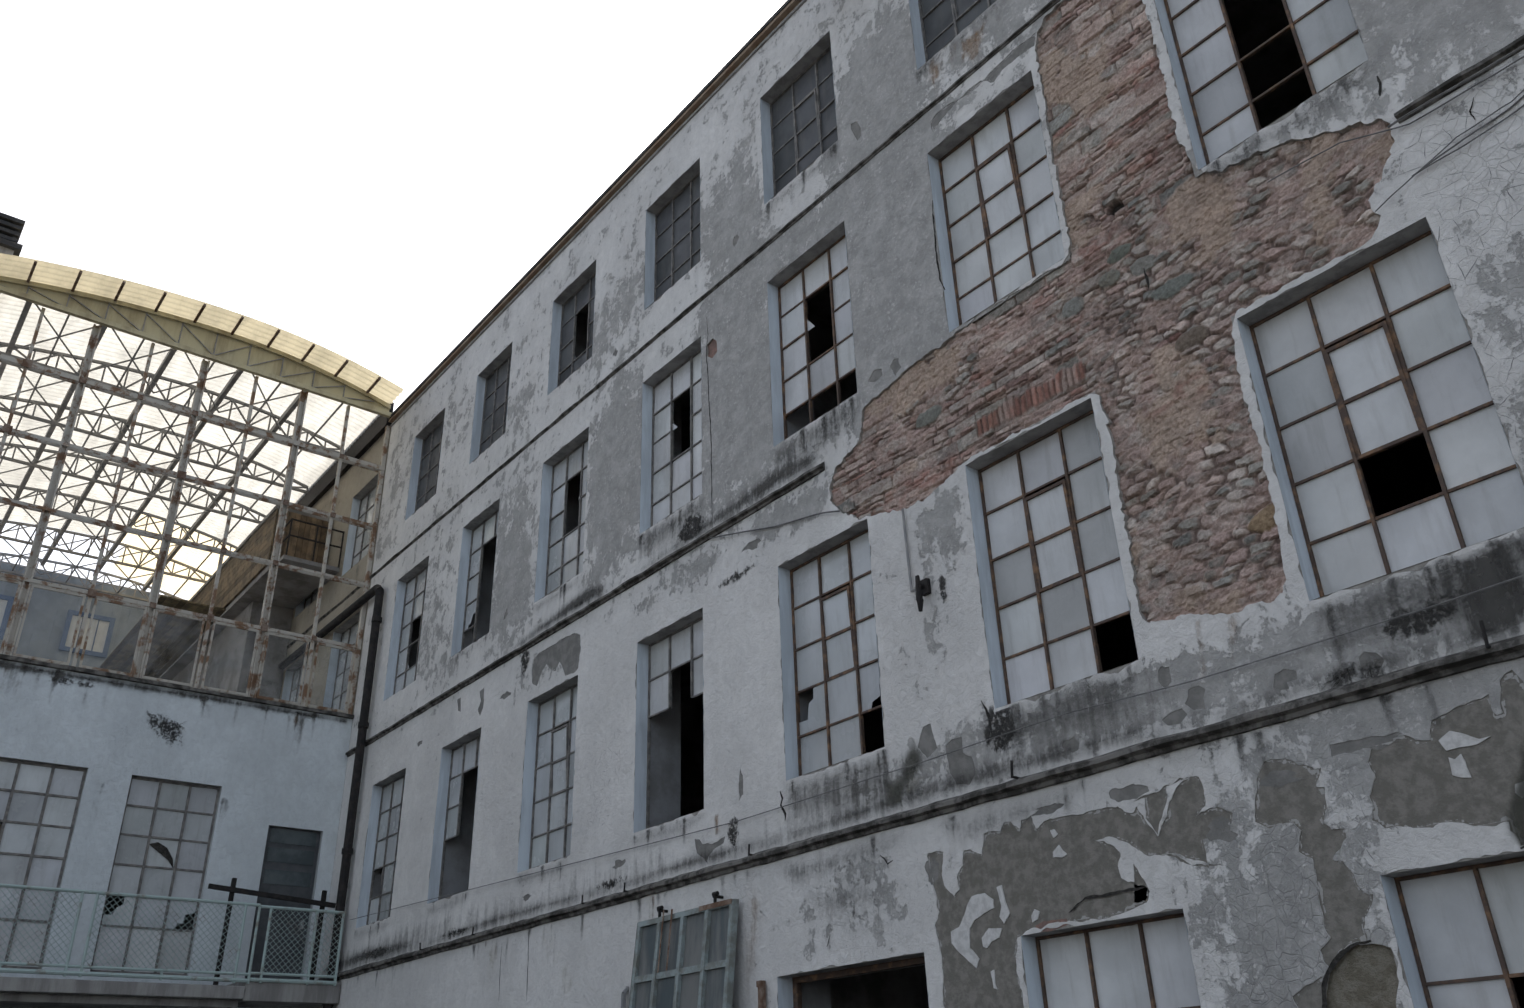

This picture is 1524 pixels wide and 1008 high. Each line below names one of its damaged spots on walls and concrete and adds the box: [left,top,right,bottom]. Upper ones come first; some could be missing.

crack [1375,76,1383,96]
crack [1390,97,1524,285]
flaking render [829,0,1395,623]
crack [1476,319,1524,433]
damp [938,576,947,602]
damp [1383,540,1524,639]
peeling [531,633,581,686]
damp [1324,662,1384,689]
peeling [918,723,976,785]
damp [832,704,1132,822]
peeling [924,776,1238,1008]
peeling [1254,669,1524,1008]